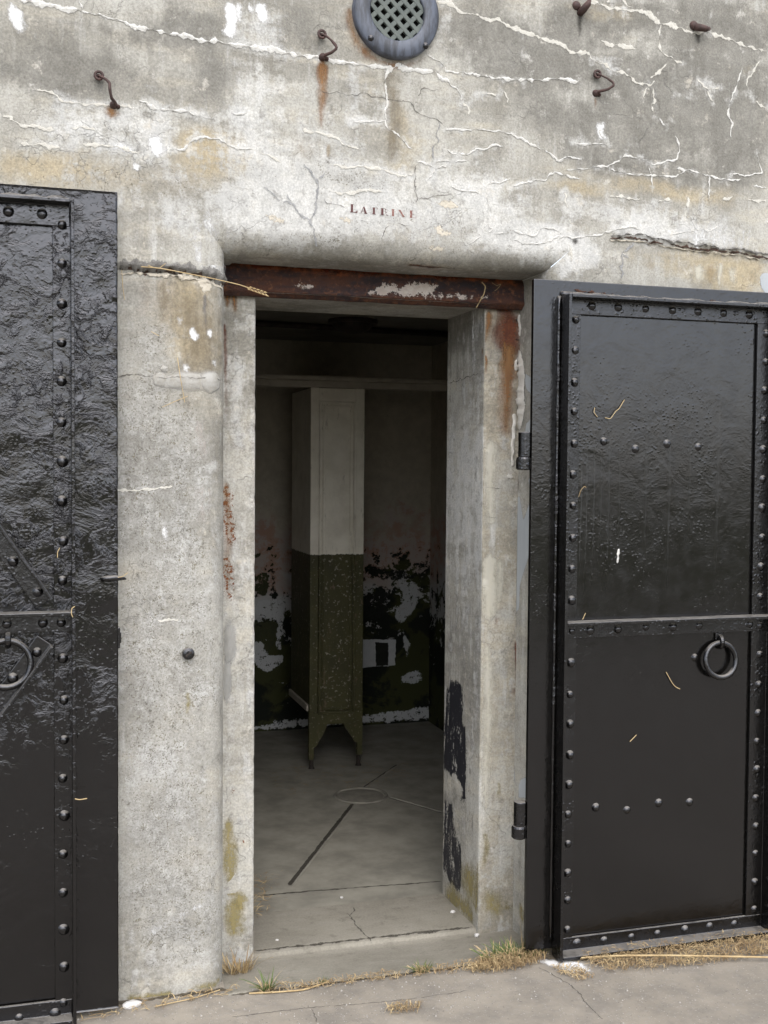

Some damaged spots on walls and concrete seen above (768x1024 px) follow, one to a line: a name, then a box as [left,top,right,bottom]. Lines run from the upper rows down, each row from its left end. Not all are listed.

corrosion [317,62,328,112]
crack [3,0,767,278]
corrosion [250,264,379,275]
spalling [368,281,488,300]
corrosion [486,309,519,429]
corrosion [223,486,236,545]
corrosion [223,558,234,600]
peeling [363,552,419,668]
peeling [254,599,286,672]
peeling [401,670,422,684]
leakage [226,894,245,934]